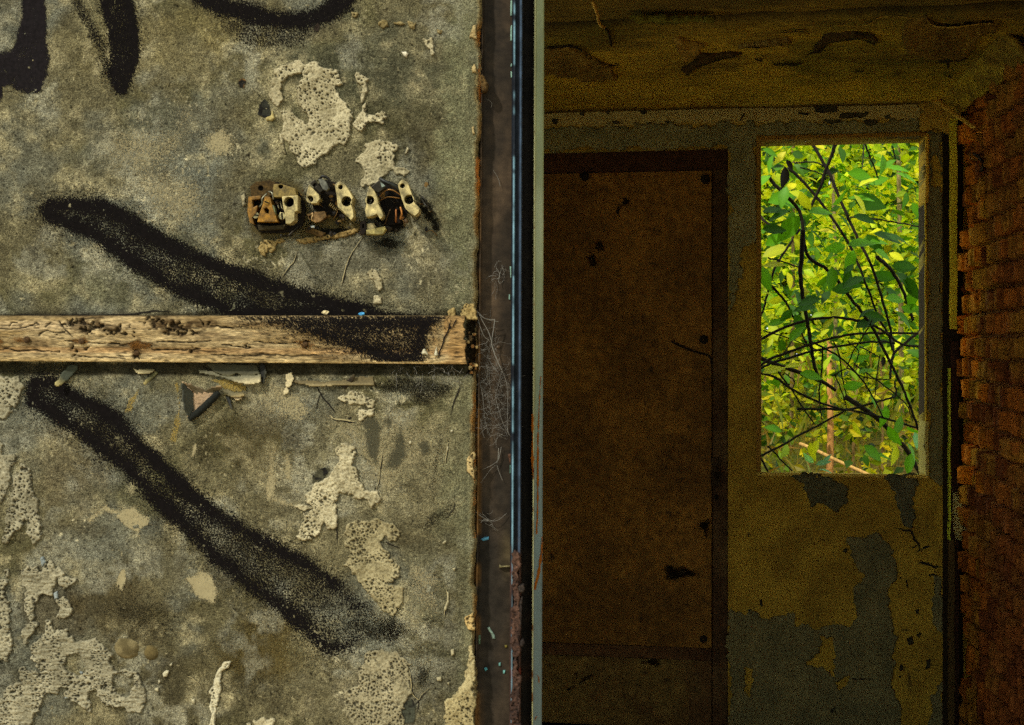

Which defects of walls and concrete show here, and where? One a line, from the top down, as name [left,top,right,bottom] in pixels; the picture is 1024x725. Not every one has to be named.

peeling [258,60,410,187]
peeling [0,440,43,545]
peeling [293,442,404,616]
corrosion [510,377,543,725]
peeling [0,556,172,725]
peeling [209,661,231,725]
peeling [343,648,416,725]
peeling [436,645,477,725]
peeling [725,532,921,725]